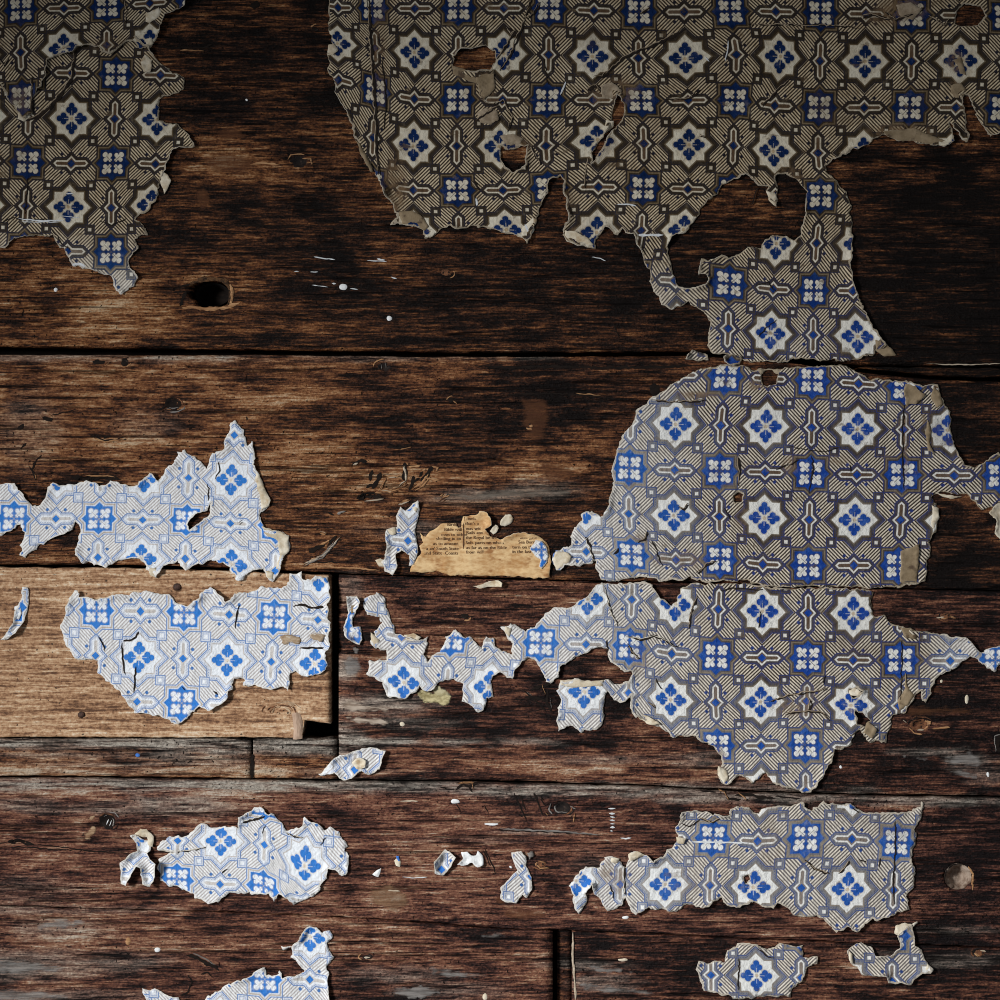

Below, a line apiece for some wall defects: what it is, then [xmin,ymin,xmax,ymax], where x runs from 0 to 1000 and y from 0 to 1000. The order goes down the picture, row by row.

spalling [352,459,439,505]
peeling [490,514,514,534]
peeling [989,503,1000,539]
peeling [343,701,388,725]